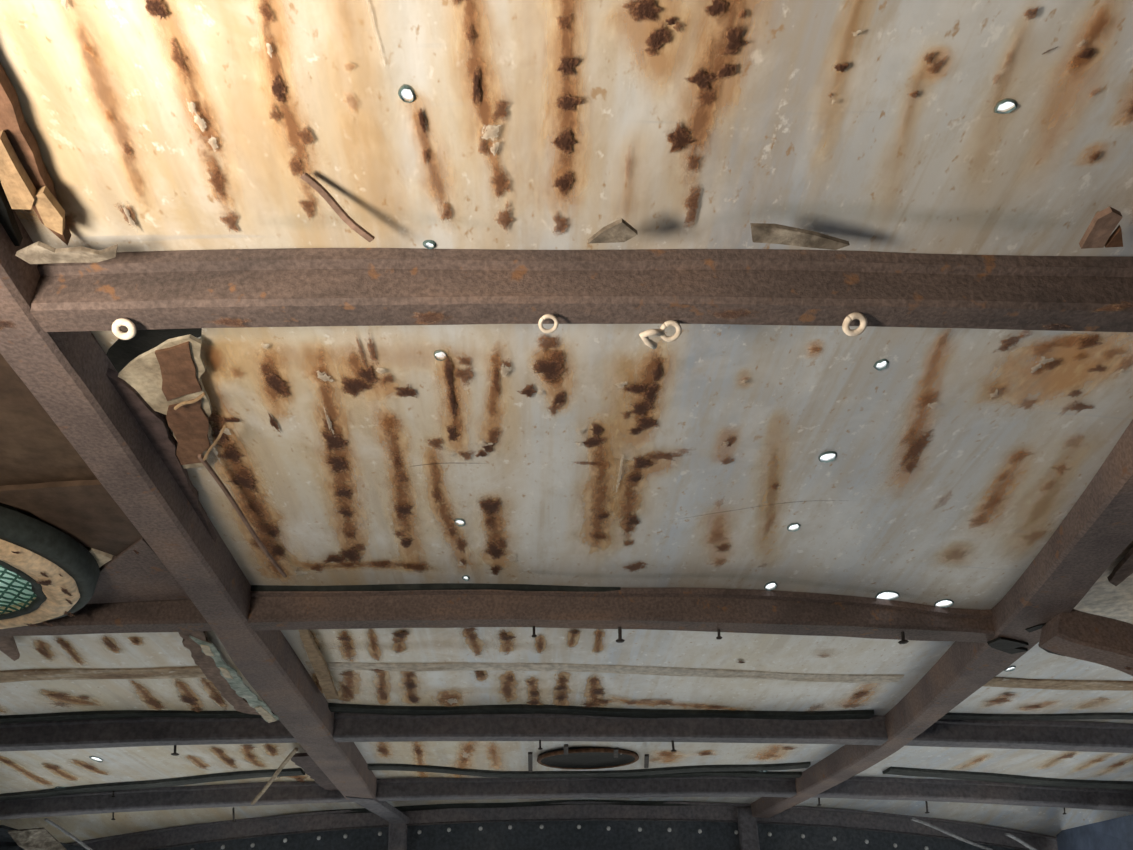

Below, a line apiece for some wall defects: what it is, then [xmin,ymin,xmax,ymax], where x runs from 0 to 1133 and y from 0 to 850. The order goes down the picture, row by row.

corrosion [145,0,238,232]
corrosion [256,0,314,218]
corrosion [454,0,512,230]
corrosion [546,0,584,199]
corrosion [623,0,683,79]
corrosion [667,0,759,172]
peeling [15,241,118,264]
corrosion [155,337,517,581]
corrosion [574,345,682,551]
corrosion [0,756,108,786]
corrosion [337,629,419,704]
corrosion [475,670,569,706]